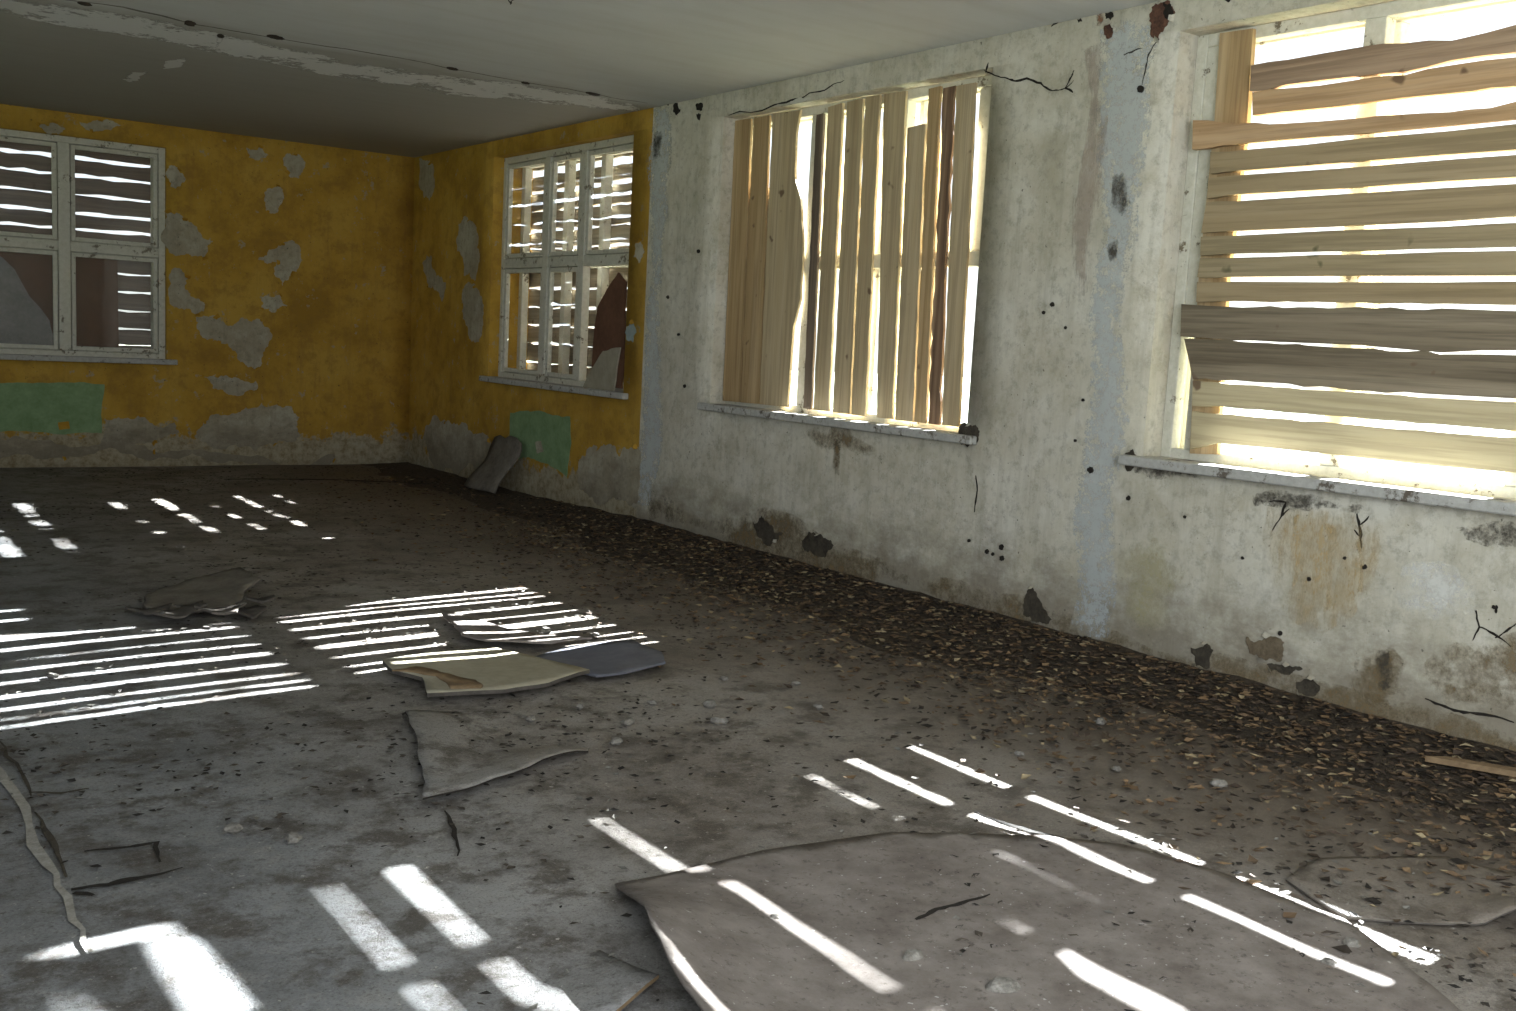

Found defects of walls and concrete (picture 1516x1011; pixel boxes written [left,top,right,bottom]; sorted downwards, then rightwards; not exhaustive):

crack [984,64,1074,93]
crack [1124,39,1159,93]
peeling [246,144,305,214]
peeling [422,216,484,342]
peeling [101,209,302,451]
peeling [421,415,491,475]
peeling [577,444,641,509]
damp [1254,492,1371,608]
damp [1461,522,1516,546]
crack [1473,605,1516,647]
damp [1212,637,1516,751]